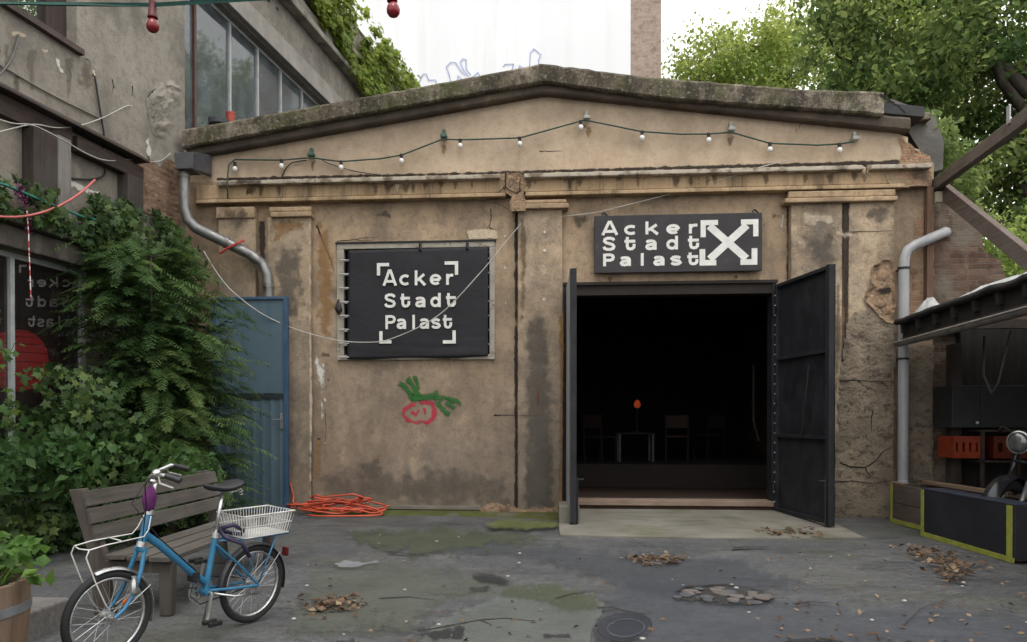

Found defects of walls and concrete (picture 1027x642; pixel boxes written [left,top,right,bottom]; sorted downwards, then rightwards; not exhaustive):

spalling [501,171,528,211]
flaking render [883,137,932,187]
spalling [864,259,896,324]
flaking render [909,207,934,314]
leakage [393,213,563,508]
crack [835,380,892,484]